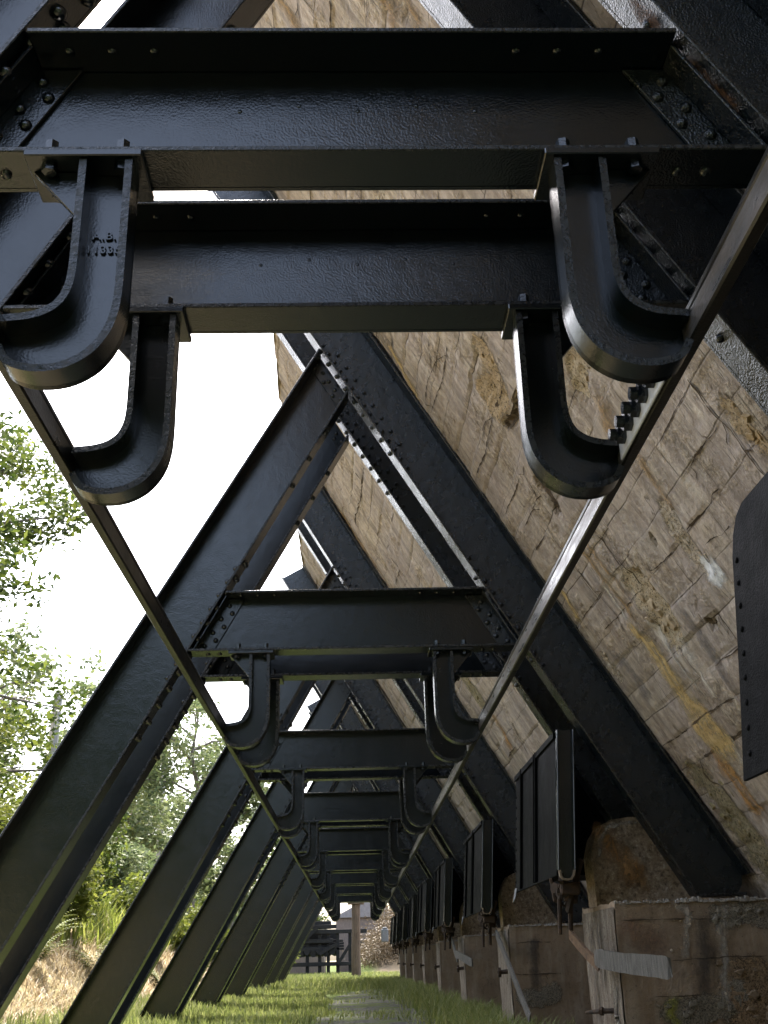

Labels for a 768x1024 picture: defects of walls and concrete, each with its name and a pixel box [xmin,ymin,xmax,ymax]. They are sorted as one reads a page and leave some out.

corrosion [630,0,662,28]
spalling [471,333,520,429]
crack [660,379,764,543]
crack [575,534,672,632]